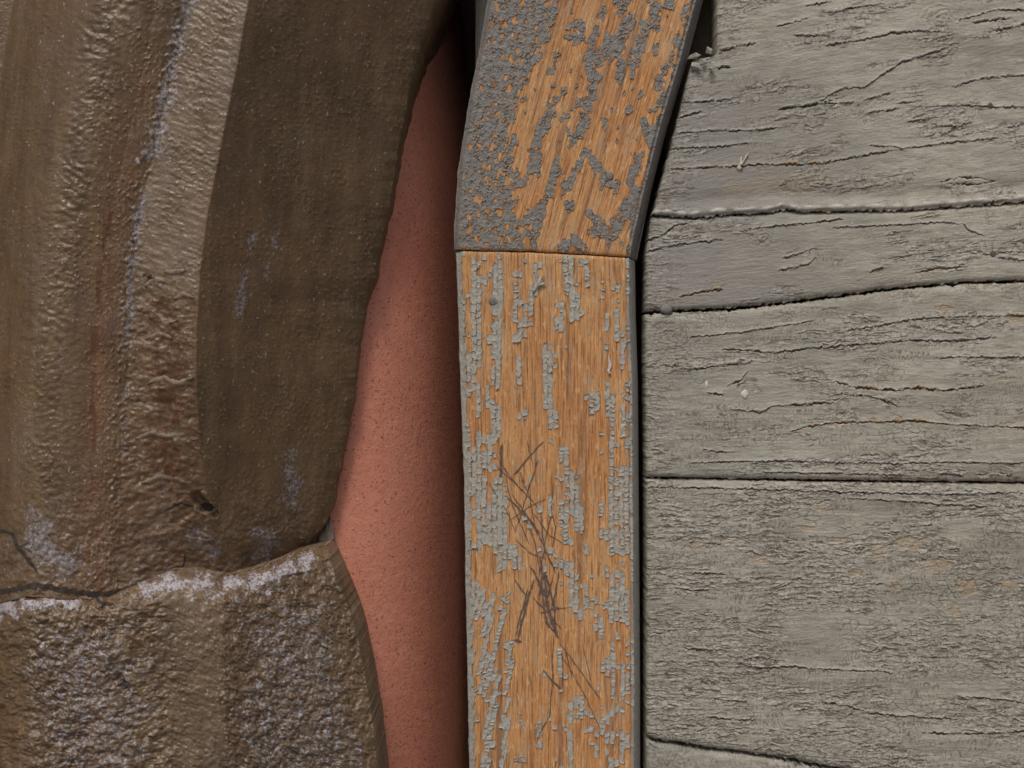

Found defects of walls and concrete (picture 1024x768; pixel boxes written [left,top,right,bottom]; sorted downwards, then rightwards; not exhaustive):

crack [670,2,1024,170]
crack [748,216,982,235]
peeling [455,0,702,768]
crack [687,313,1024,431]
crack [654,450,1023,509]
leakage [25,505,87,578]
crack [0,529,153,605]
leakage [0,597,81,623]
leakage [13,618,166,768]
leakage [139,527,364,768]
crack [686,646,892,674]
crack [822,696,1024,735]